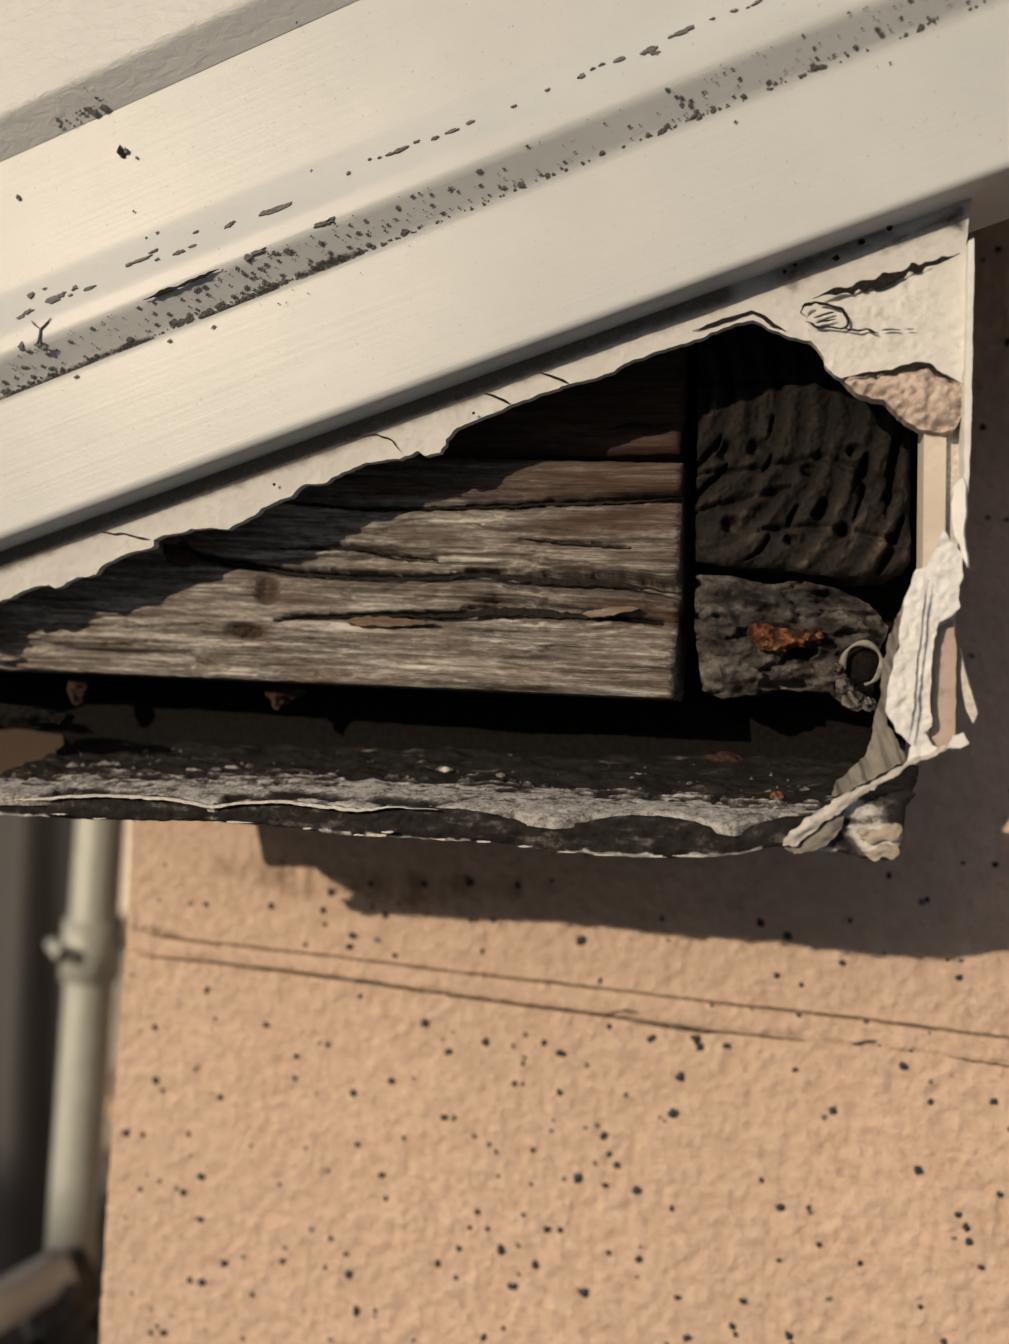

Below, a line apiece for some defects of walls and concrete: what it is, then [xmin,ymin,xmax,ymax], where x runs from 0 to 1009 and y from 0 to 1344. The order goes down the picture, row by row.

damp [759,0,985,91]
damp [56,87,109,128]
peeling [368,120,475,161]
damp [622,64,747,148]
peeling [16,285,97,320]
peeling [125,230,199,267]
damp [0,145,605,400]
damp [0,286,731,569]
spalling [840,367,962,437]
rust [747,622,824,652]
peeling [783,478,979,847]
crack [144,935,1009,1067]